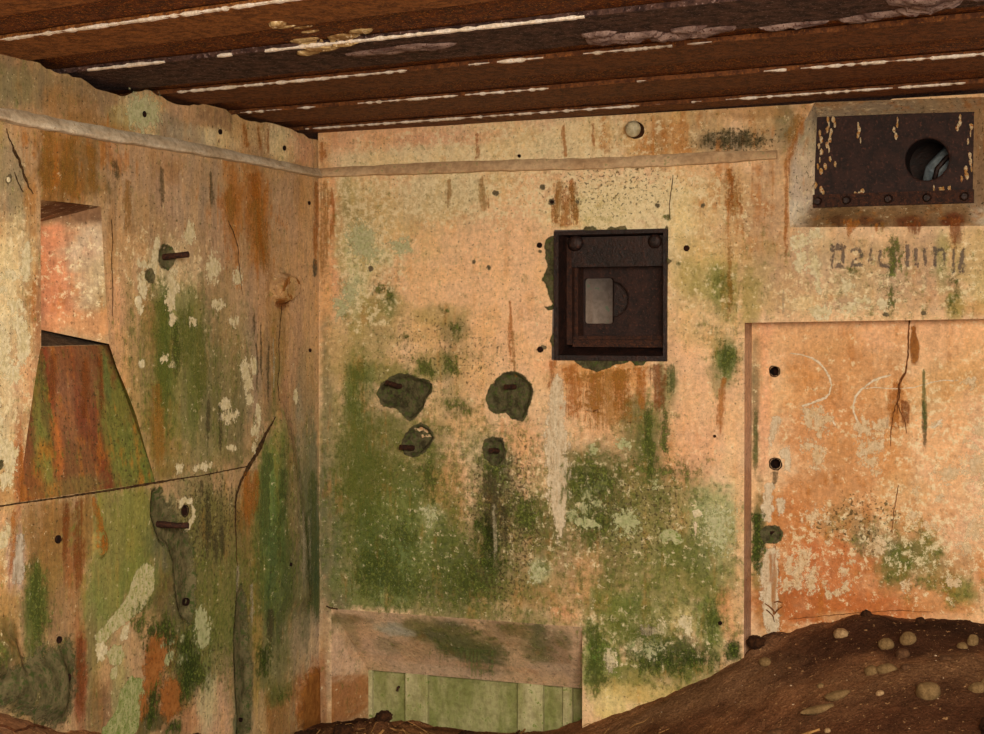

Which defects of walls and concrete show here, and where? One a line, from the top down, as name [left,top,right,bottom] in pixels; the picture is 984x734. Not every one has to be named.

crack [6,128,34,194]
rust [551,179,578,226]
crack [0,310,282,598]
leakage [253,315,270,394]
spalling [376,373,434,457]
spalling [482,436,507,480]
spalling [485,371,533,422]
efflorescence [541,373,572,539]
rust [548,361,666,418]
leakage [642,409,670,483]
crack [890,320,911,445]